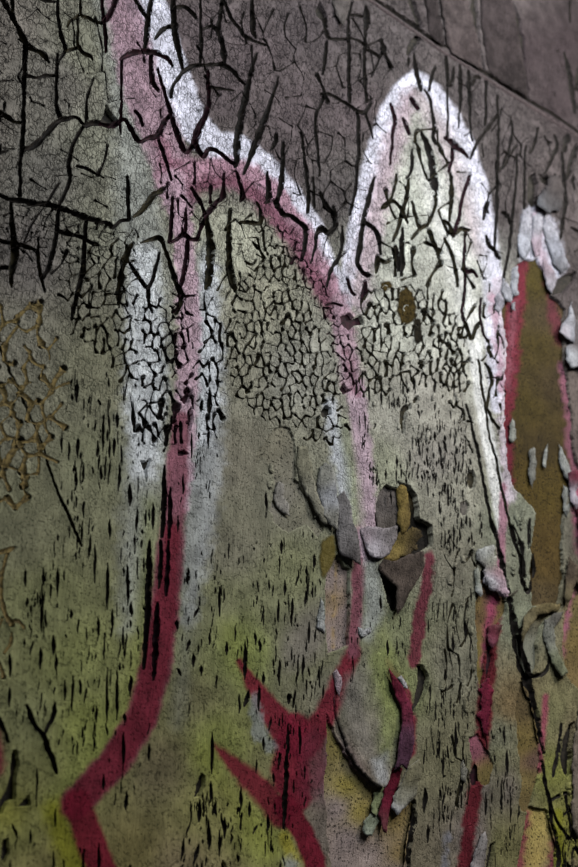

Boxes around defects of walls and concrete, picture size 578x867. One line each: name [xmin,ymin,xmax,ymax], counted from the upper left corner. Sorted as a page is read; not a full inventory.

crack [134,109,144,127]
crack [409,97,420,111]
peeling [494,266,519,314]
peeling [559,302,578,368]
peeling [296,430,425,614]
crack [358,412,388,486]
peeling [528,444,548,486]
peeling [559,446,578,524]
crack [0,465,185,810]
peeling [333,660,422,836]
crack [479,720,520,866]
crack [540,723,578,867]